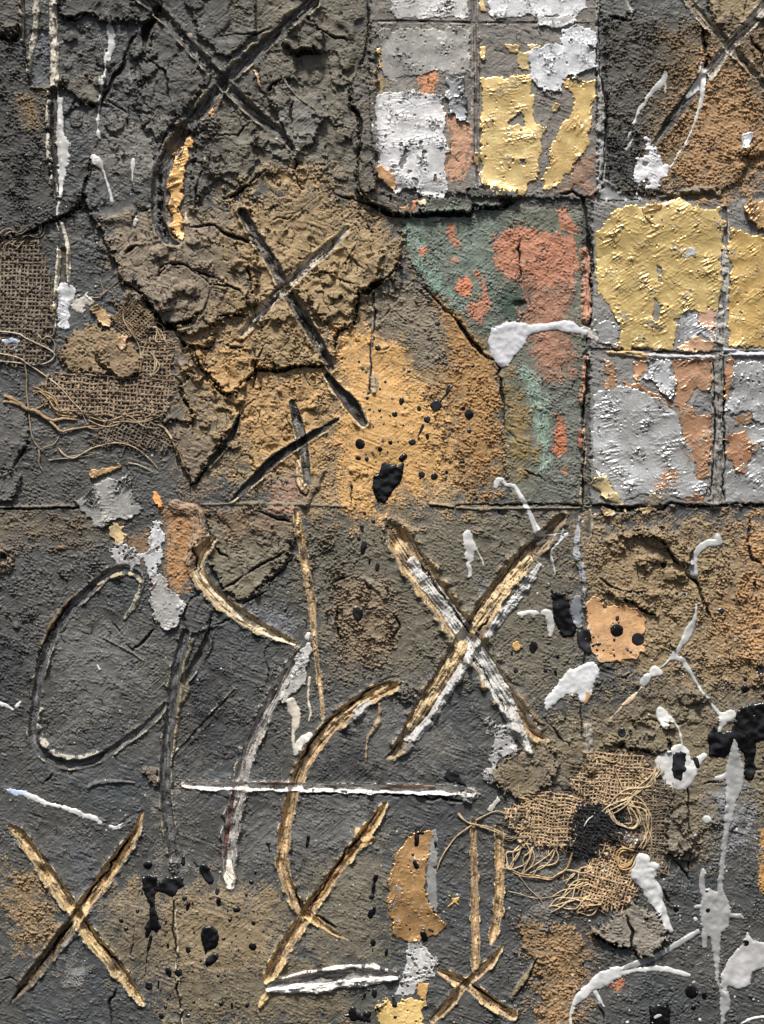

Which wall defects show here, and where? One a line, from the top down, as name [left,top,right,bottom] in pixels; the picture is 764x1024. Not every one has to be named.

crack [0,1,408,810]
crack [508,852,614,1023]
crack [620,889,685,1017]